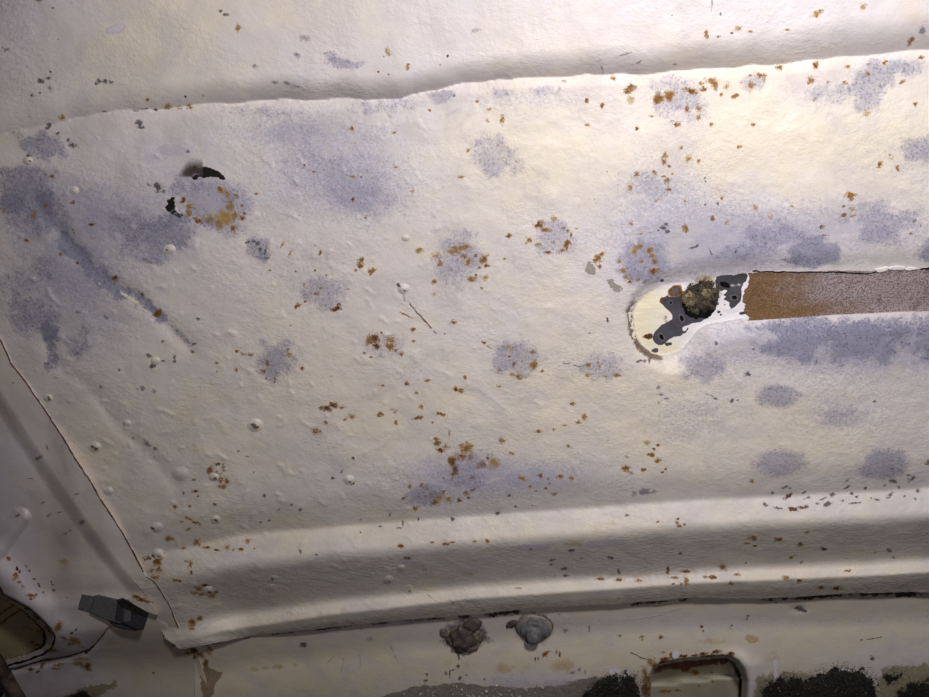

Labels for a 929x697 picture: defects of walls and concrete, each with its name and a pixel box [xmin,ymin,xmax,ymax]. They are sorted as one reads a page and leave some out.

rust [653,77,739,104]
peeling [0,123,168,322]
peeling [115,176,268,264]
rust [180,186,246,231]
peeling [710,225,840,269]
peeling [0,277,61,371]
peeling [607,239,750,363]
rust [742,266,929,321]
peeling [752,316,929,365]
rust [401,431,500,511]
mould [754,661,929,697]